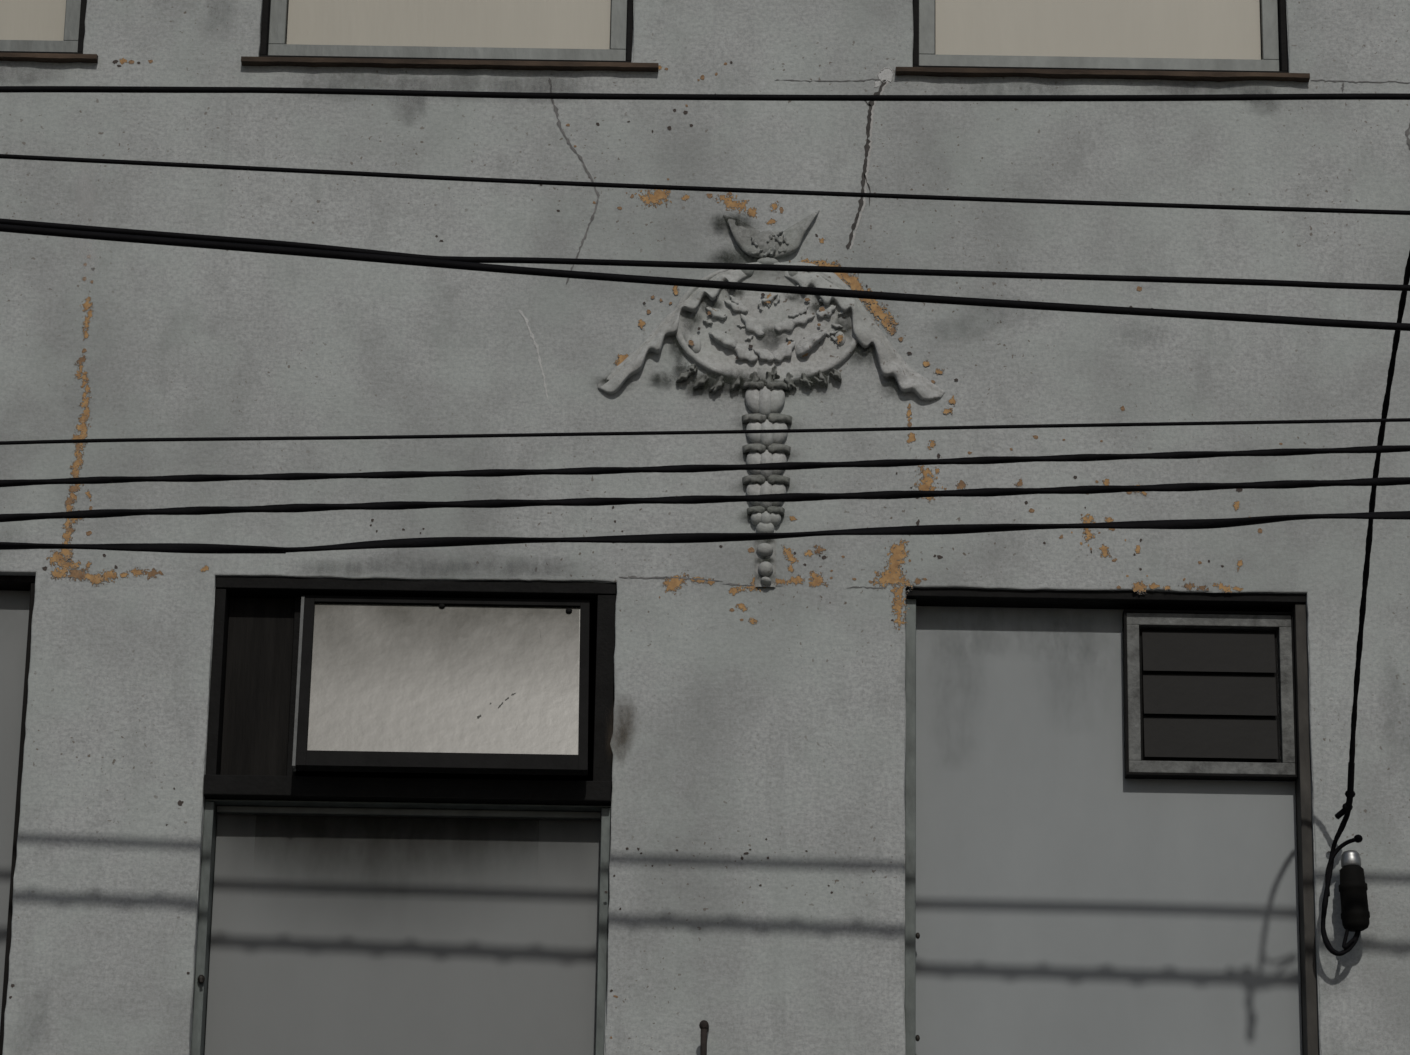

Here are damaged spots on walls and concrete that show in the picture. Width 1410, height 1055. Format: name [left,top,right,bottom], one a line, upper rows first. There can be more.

crack [548,78,600,284]
peeling [617,178,784,225]
crack [774,79,888,249]
crack [1311,79,1410,92]
crack [1402,123,1410,149]
peeling [789,234,958,415]
peeling [42,254,164,587]
peeling [659,545,845,624]
peeling [852,538,927,630]
peeling [1043,479,1244,595]